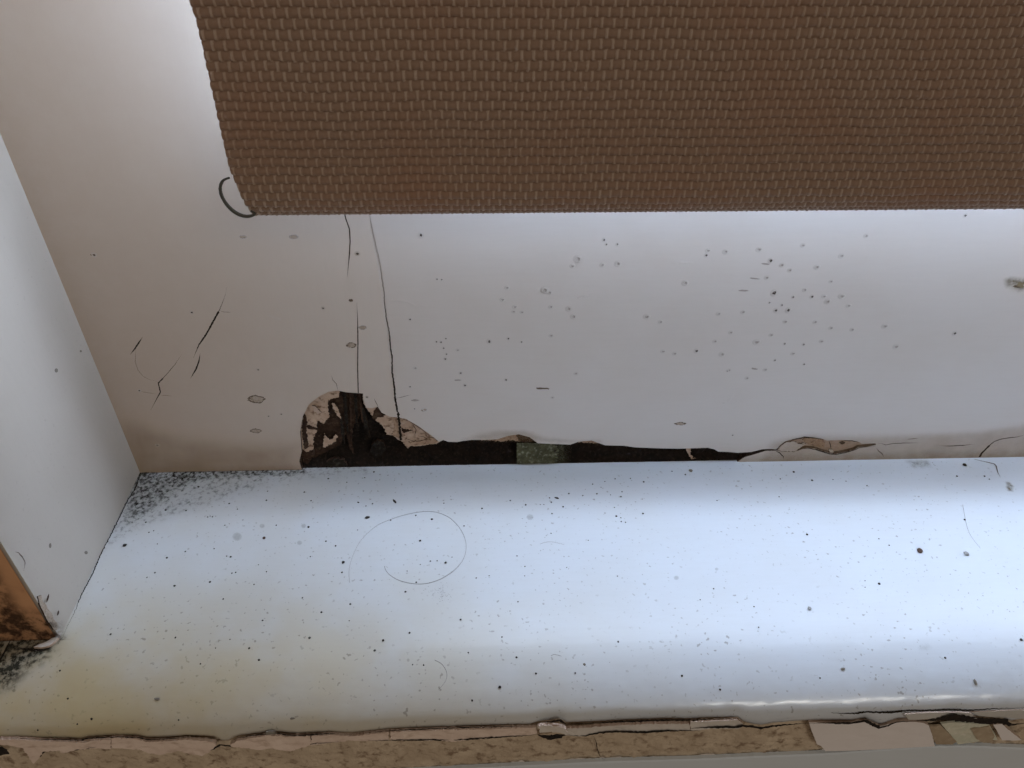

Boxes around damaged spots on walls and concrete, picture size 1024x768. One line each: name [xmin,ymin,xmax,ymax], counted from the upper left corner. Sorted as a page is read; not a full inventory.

crack [131,302,223,409]
crack [332,215,427,442]
spalling [301,401,542,468]
spalling [557,437,872,463]
damp [131,467,306,519]
damp [0,604,61,685]
spalling [0,709,1024,768]